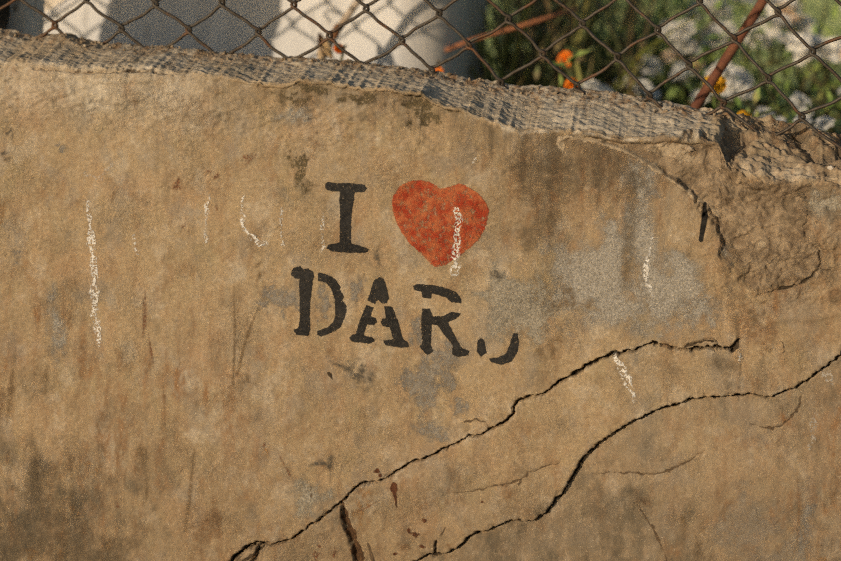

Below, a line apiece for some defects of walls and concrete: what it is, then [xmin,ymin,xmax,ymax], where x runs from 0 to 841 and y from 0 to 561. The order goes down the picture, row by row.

spalling [472,128,841,345]
crack [230,541,265,561]
crack [464,339,739,435]
crack [415,354,841,561]